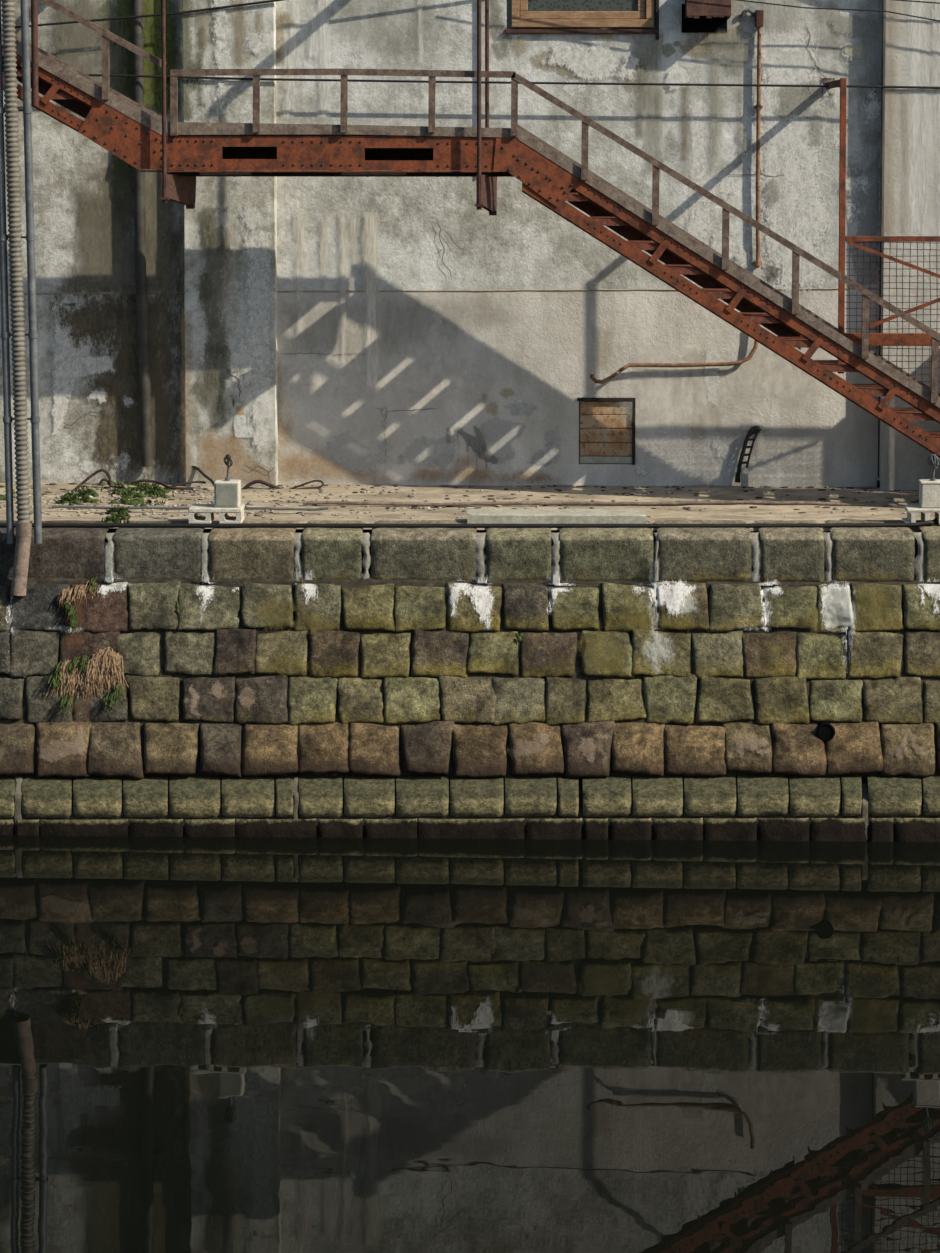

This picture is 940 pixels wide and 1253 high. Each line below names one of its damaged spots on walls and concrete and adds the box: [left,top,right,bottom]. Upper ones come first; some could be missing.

water stain [56,0,131,97]
water stain [49,158,238,481]
spalling [447,401,537,471]
efflorescence [448,576,493,631]
water stain [547,571,572,612]
water stain [621,561,696,671]
efflorescence [750,550,783,631]
efflorescence [820,580,855,678]
efflorescence [918,578,940,614]